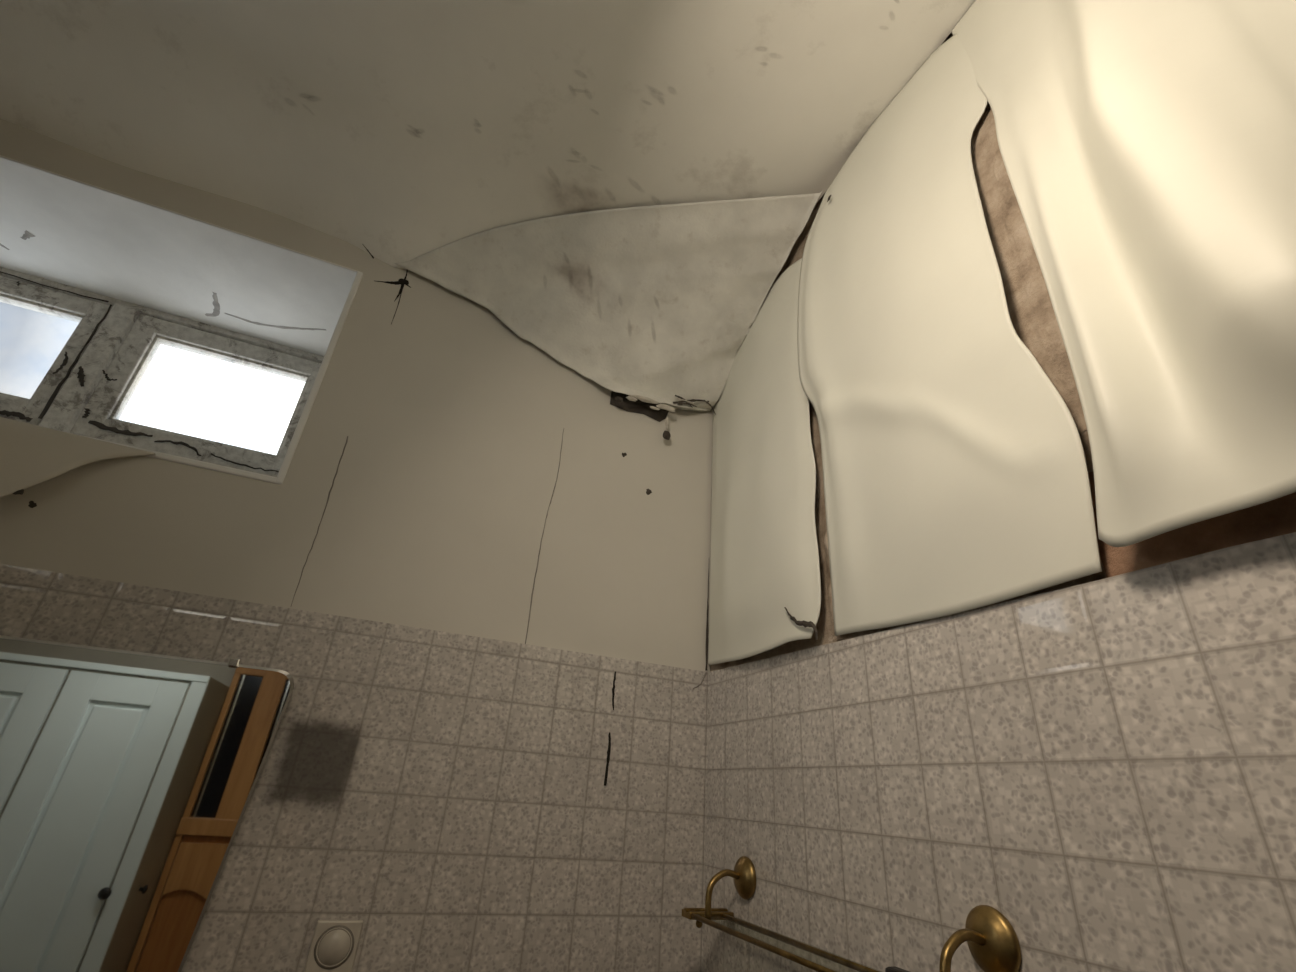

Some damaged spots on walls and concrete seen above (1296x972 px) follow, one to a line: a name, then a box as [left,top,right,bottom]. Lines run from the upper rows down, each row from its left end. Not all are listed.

crack [0,230,35,250]
flaking render [976,110,1087,433]
spalling [822,502,853,643]
flaking render [1088,471,1296,578]
crack [604,671,616,786]